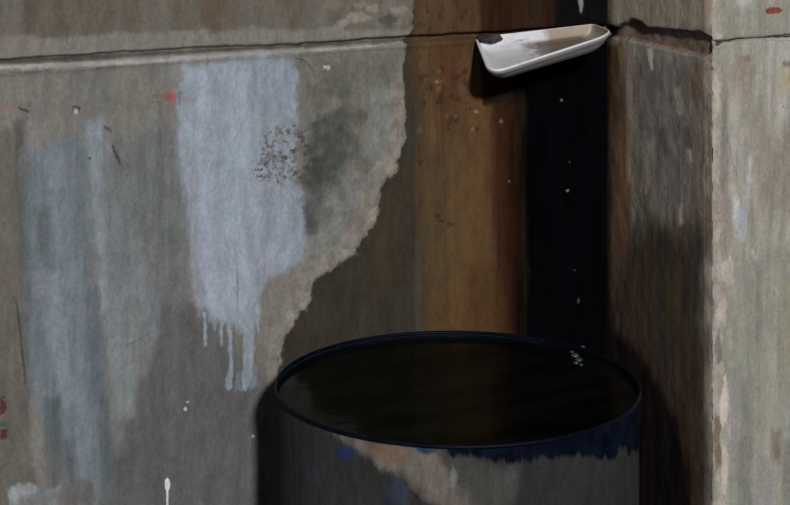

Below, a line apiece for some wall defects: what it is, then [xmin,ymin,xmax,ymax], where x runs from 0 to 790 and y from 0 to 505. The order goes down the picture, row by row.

crack [6,67,55,76]
crack [94,63,129,71]
crack [712,32,790,49]
peeling [237,111,330,198]
damp [183,58,410,408]
spalling [619,9,734,500]
damp [620,38,790,505]